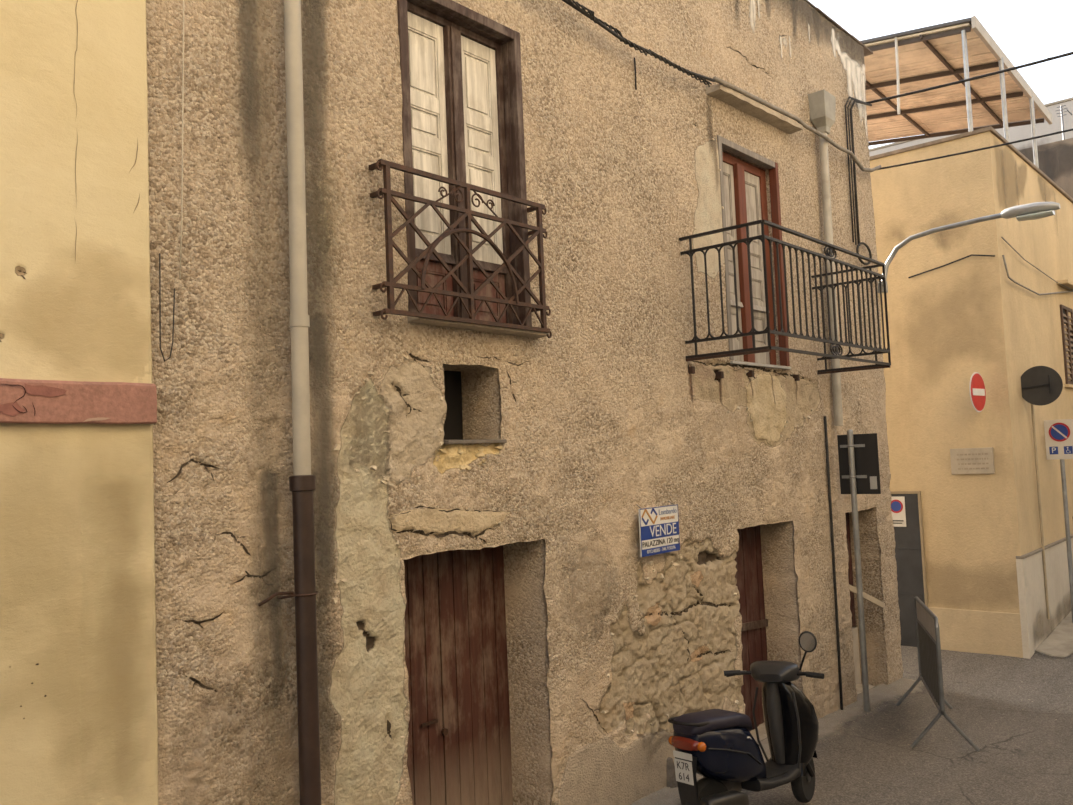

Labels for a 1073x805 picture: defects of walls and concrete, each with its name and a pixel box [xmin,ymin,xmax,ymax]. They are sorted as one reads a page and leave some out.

flaking render [693,359,821,447]
flaking render [329,357,510,805]
flaking render [597,538,744,761]